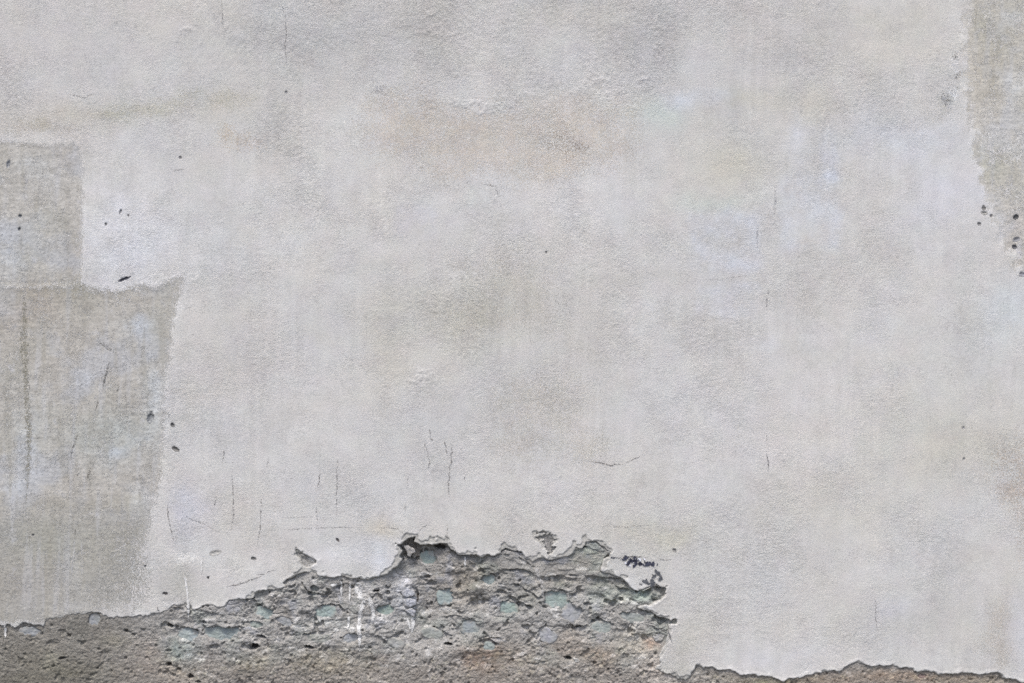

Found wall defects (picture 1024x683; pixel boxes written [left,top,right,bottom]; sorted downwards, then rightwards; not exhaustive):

damp [20,292,32,512]
spalling [0,140,1020,683]